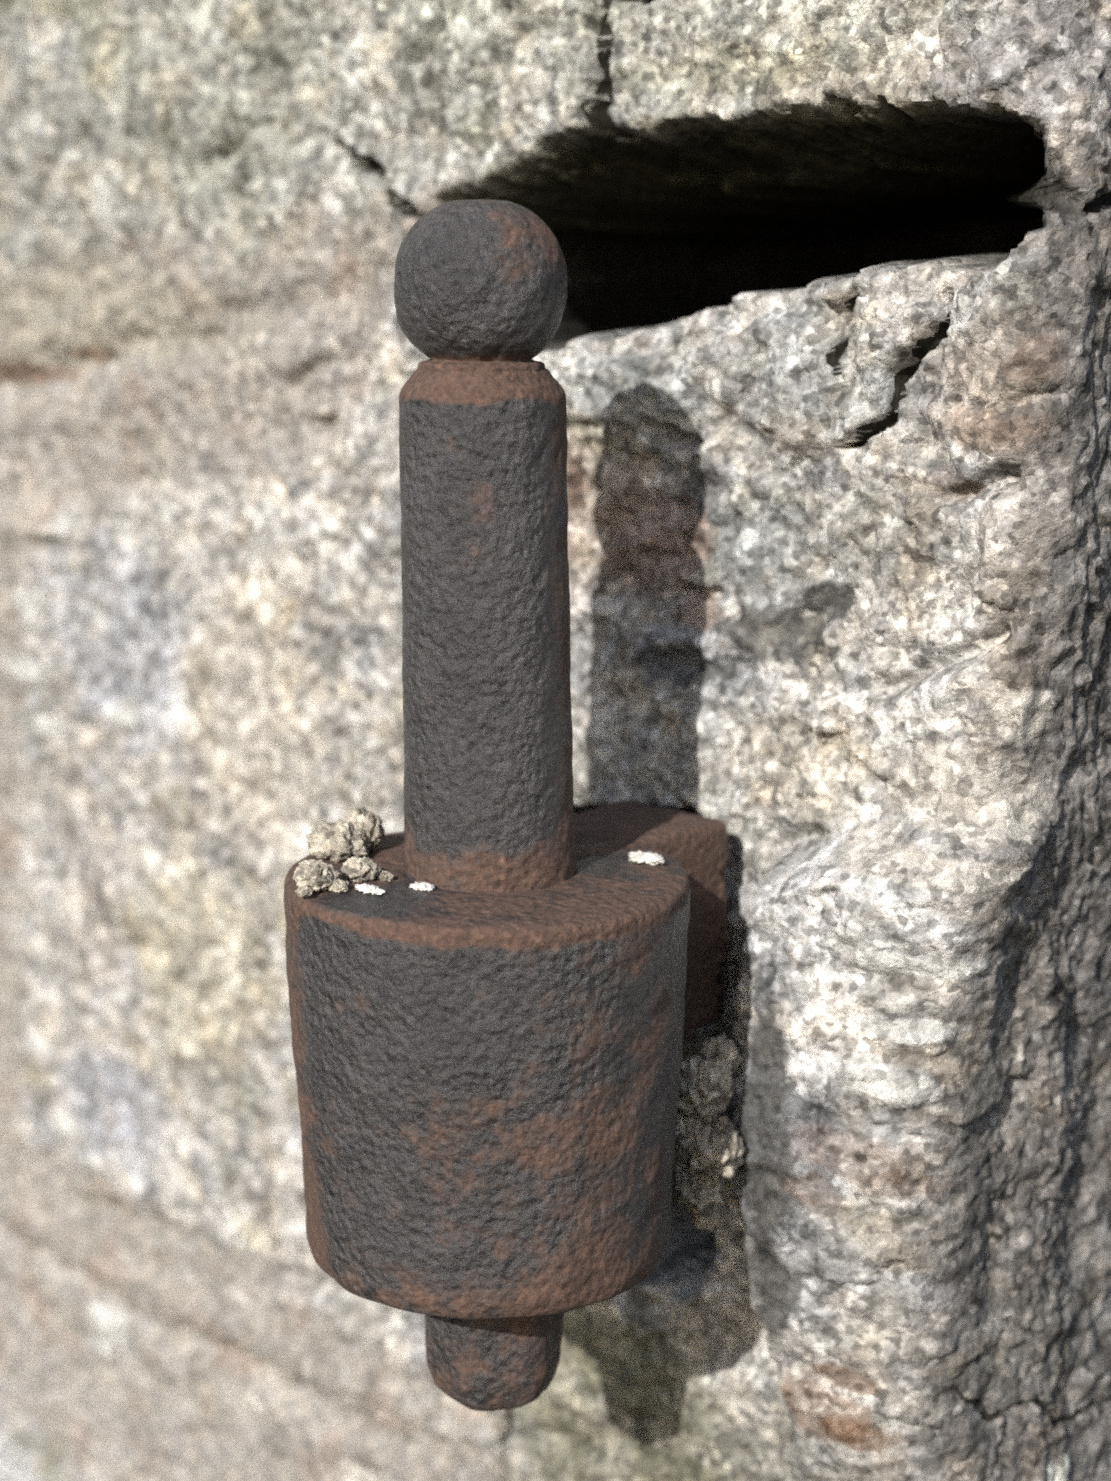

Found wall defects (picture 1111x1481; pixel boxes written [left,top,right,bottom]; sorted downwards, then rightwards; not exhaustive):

crack [581,0,678,157]
spalling [430,95,1092,355]
crack [1082,193,1111,212]
crack [955,1387,1111,1427]